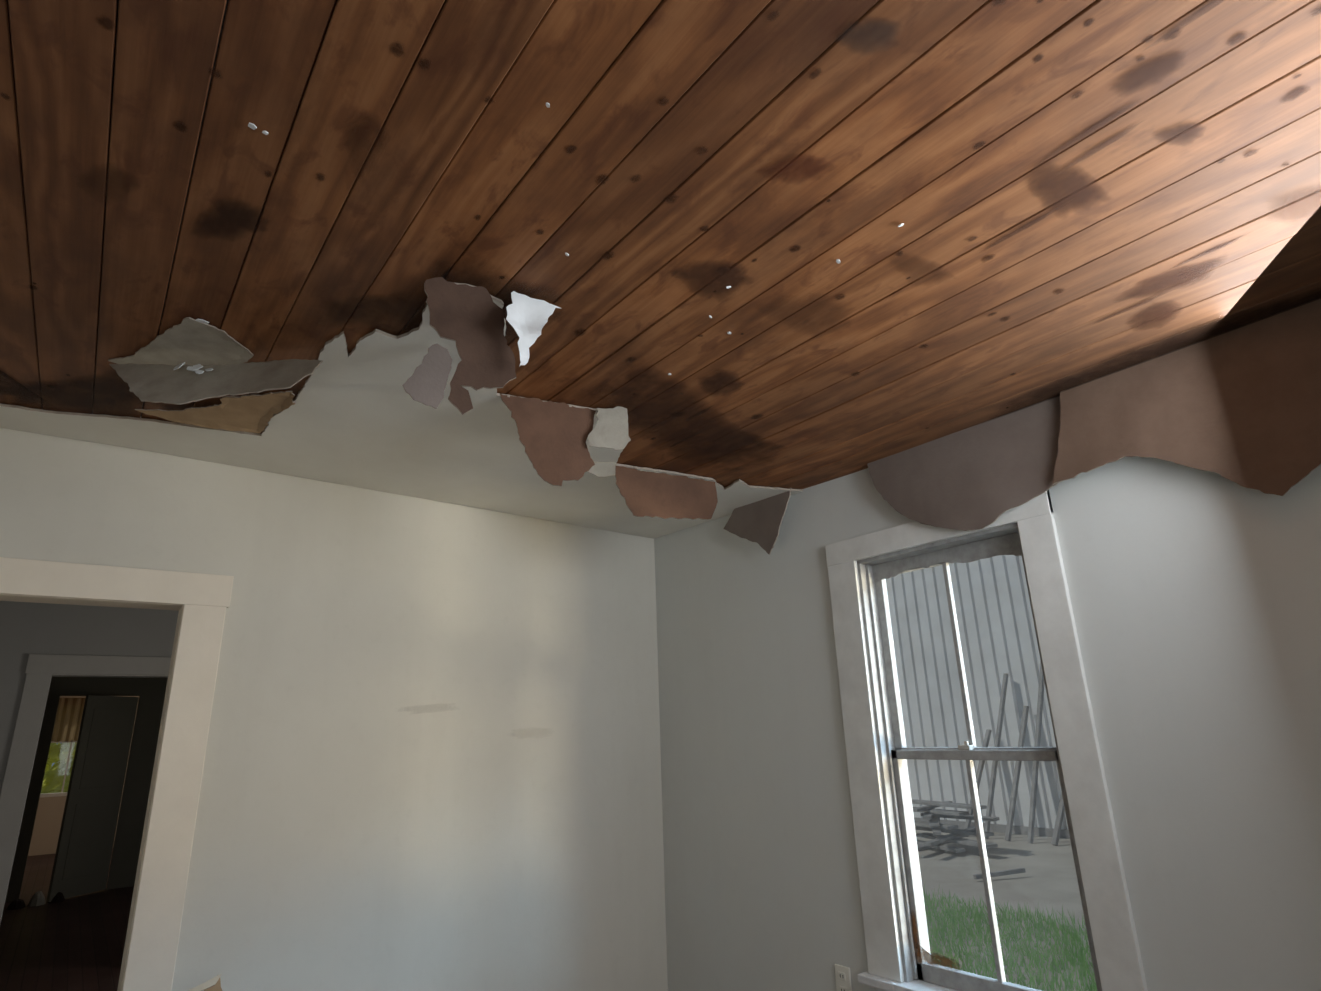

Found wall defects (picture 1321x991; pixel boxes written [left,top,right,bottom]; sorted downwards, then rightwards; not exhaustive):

leakage [989,55,1182,247]
leakage [1162,125,1202,142]
leakage [679,264,746,294]
peeling [506,291,562,367]
peeling [108,317,323,433]
peeling [588,406,631,477]
leakage [614,373,765,461]